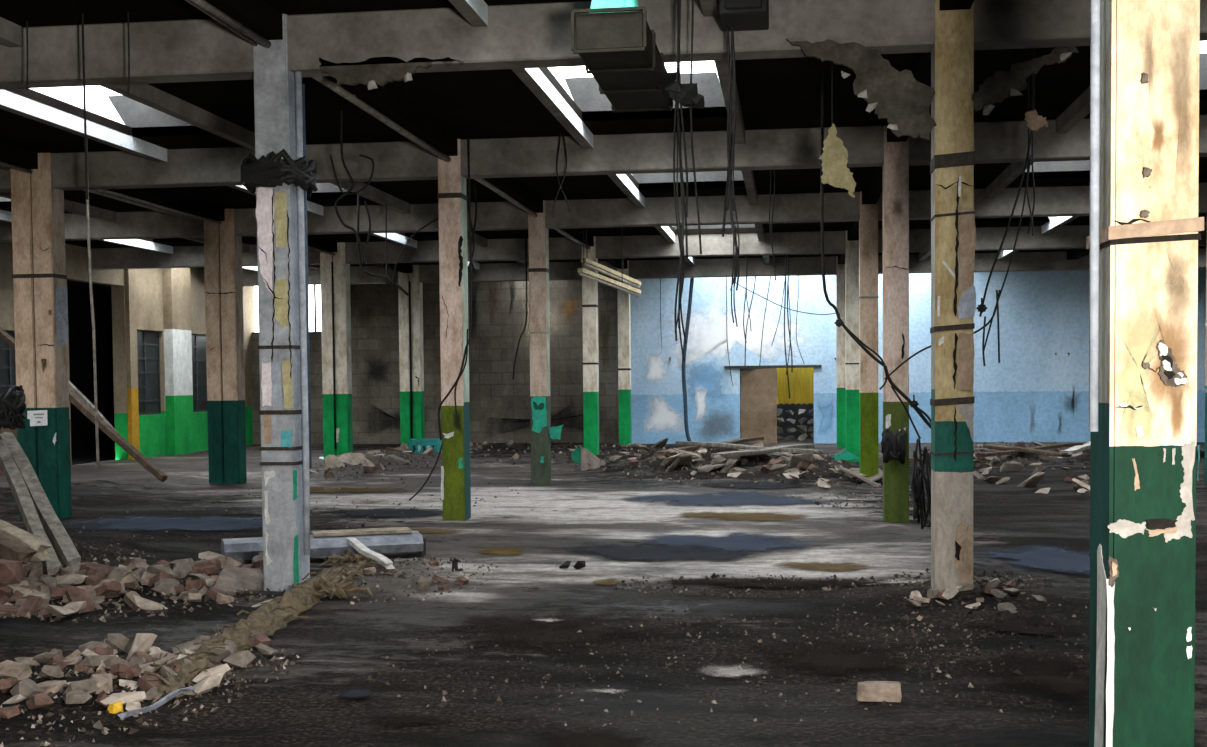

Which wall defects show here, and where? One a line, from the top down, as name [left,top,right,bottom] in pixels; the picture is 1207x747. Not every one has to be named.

spalling [319,56,464,90]
spalling [786,39,937,141]
spalling [971,46,1079,115]
crack [938,177,975,389]
peeling [647,356,671,379]
spalling [1141,340,1188,387]
peeling [531,396,547,433]
peeling [647,399,679,430]
peeling [696,392,706,419]
peeling [1094,441,1200,747]